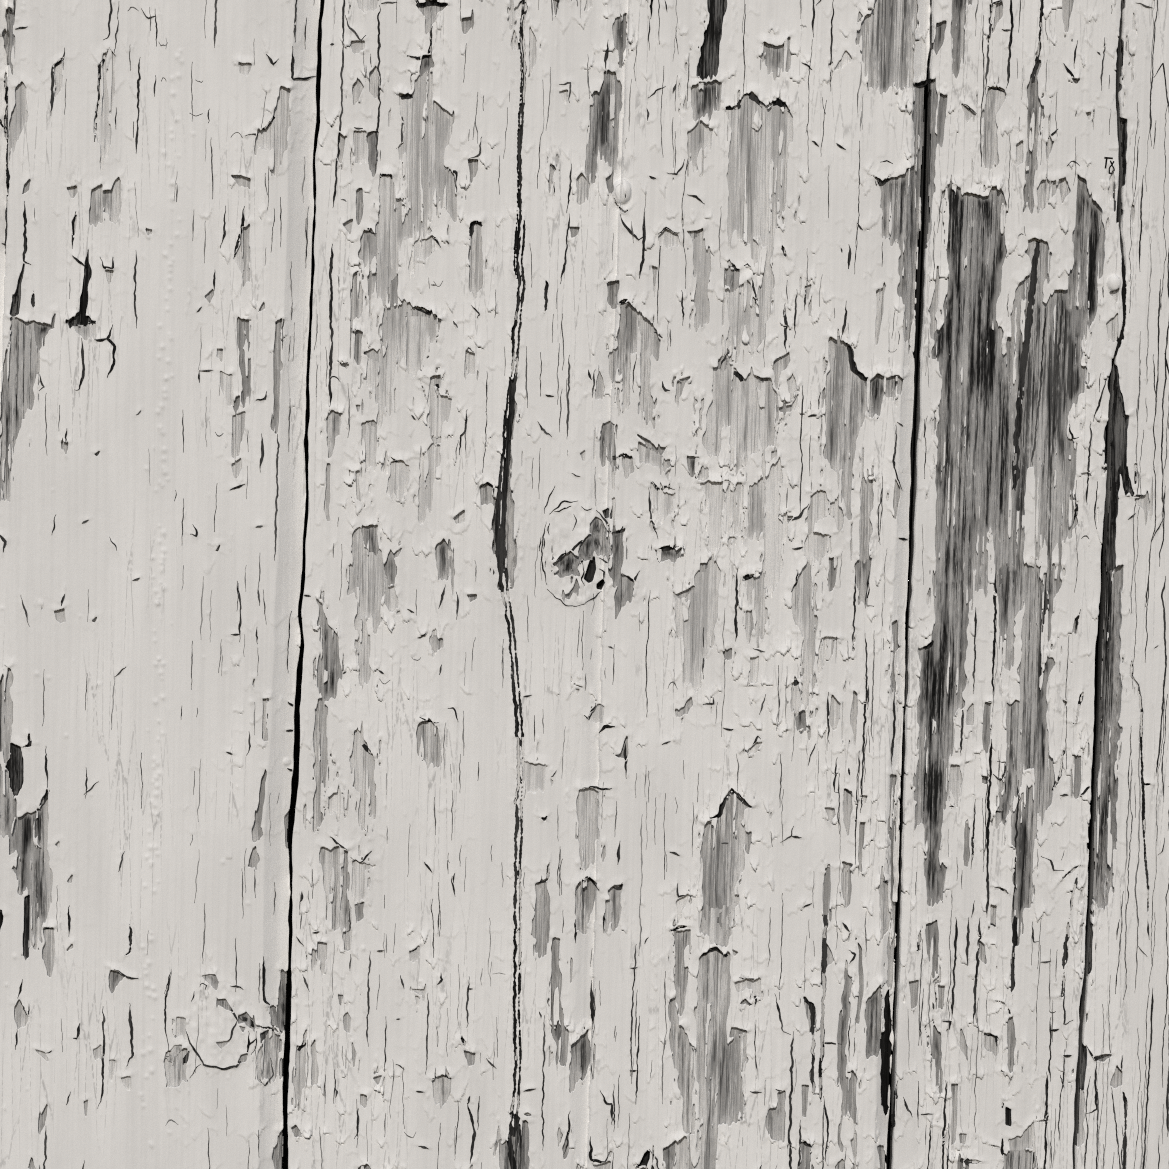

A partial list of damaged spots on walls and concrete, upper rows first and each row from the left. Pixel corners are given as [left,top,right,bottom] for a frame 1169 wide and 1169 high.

crack [0,77,35,307]
crack [20,673,50,810]
peeling [0,249,114,502]
crack [39,212,138,453]
peeling [304,0,487,951]
peeling [479,353,523,606]
crack [94,0,927,1169]
peeling [567,0,910,751]
peeling [796,0,1153,1169]
crack [890,0,1169,1169]
crack [47,924,149,1109]
peeling [652,785,772,1169]